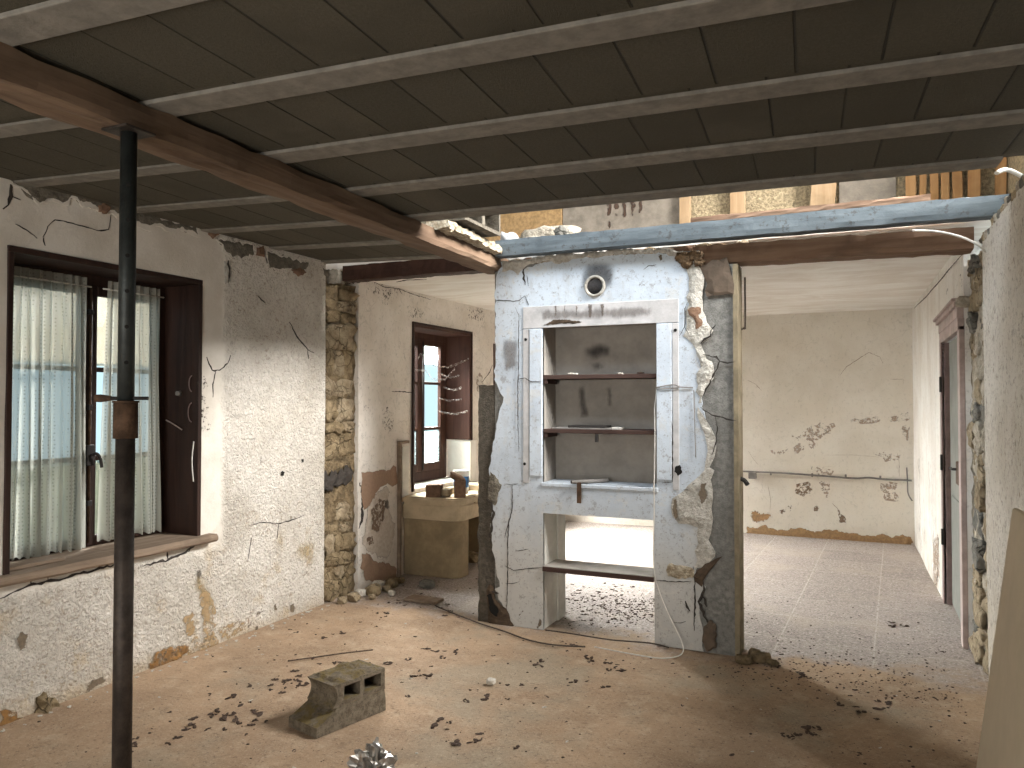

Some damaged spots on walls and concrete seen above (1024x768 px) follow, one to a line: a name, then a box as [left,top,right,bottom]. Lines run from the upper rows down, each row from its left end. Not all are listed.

crack [3,184,111,245]
flaking render [9,180,119,219]
damp [607,201,642,228]
crack [206,355,231,394]
crack [679,302,760,454]
flaking render [137,213,398,602]
flaking render [666,261,722,587]
peeling [771,423,835,454]
peeling [795,467,833,496]
crack [144,546,195,566]
crack [248,515,304,558]
peeling [702,620,717,652]